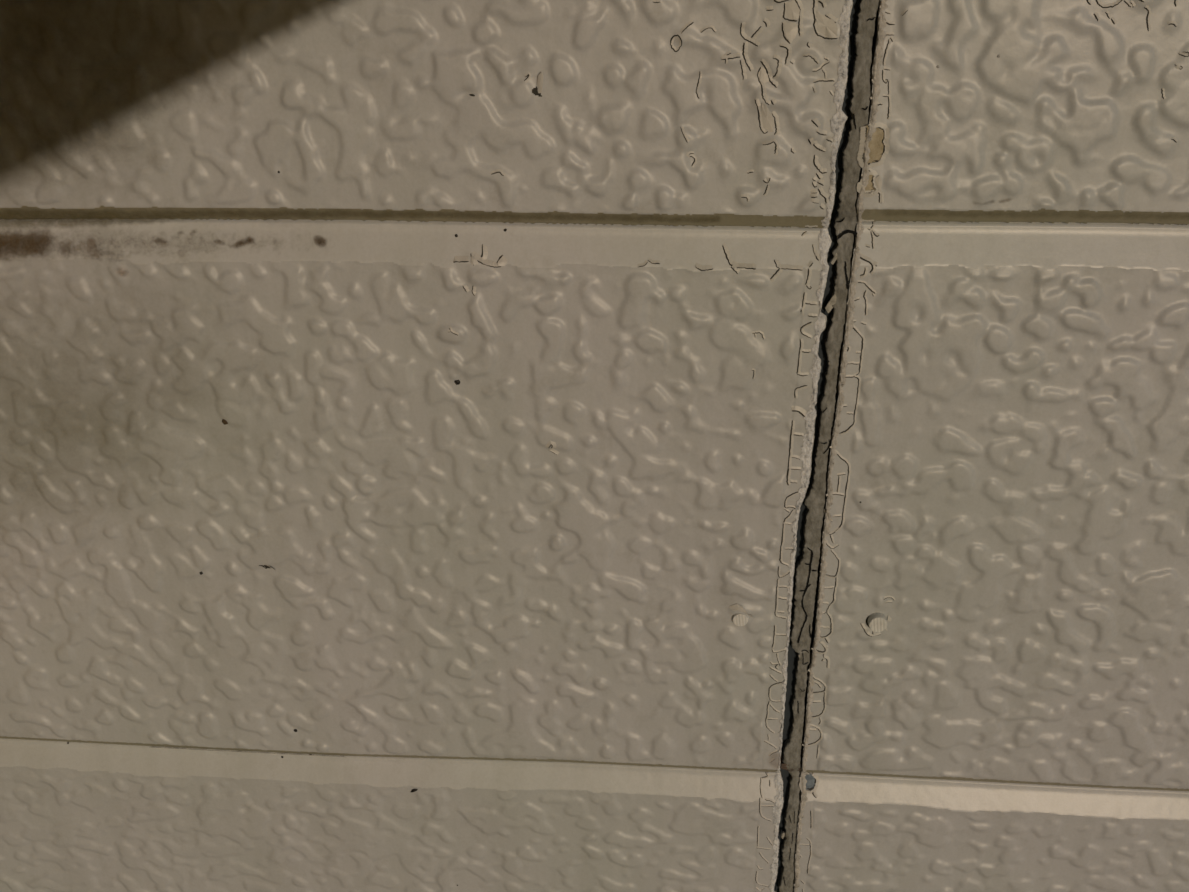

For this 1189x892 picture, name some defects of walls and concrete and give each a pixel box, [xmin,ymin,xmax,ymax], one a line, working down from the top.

crack [638,258,661,267]
crack [670,0,908,892]
spalling [768,0,890,892]